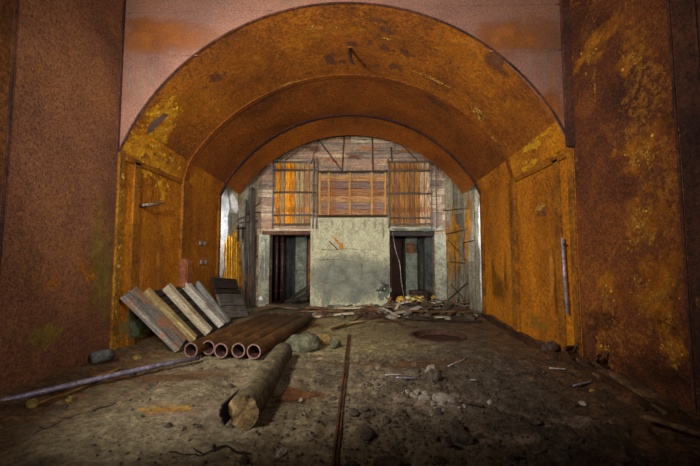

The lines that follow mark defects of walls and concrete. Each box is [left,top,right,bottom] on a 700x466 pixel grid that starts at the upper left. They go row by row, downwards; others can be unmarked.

peeling [122,94,185,209]
corrosion [624,132,658,176]
corrosion [446,194,471,284]
corrosion [630,259,685,371]